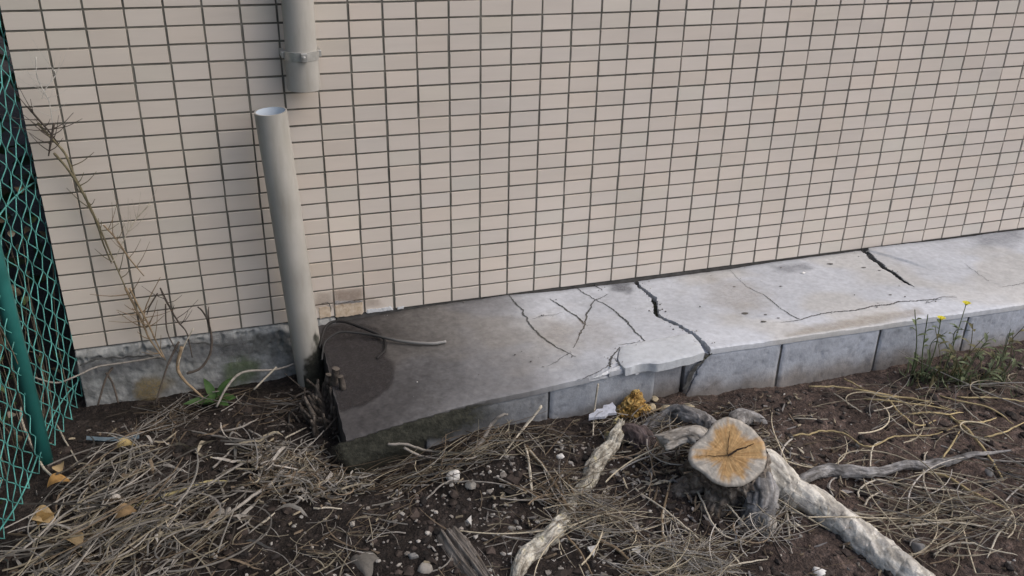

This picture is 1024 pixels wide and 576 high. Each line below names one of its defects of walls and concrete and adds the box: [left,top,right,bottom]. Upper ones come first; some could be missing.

crack [732,249,948,322]
water stain [323,325,394,409]
crack [507,285,658,380]
crack [683,352,712,390]